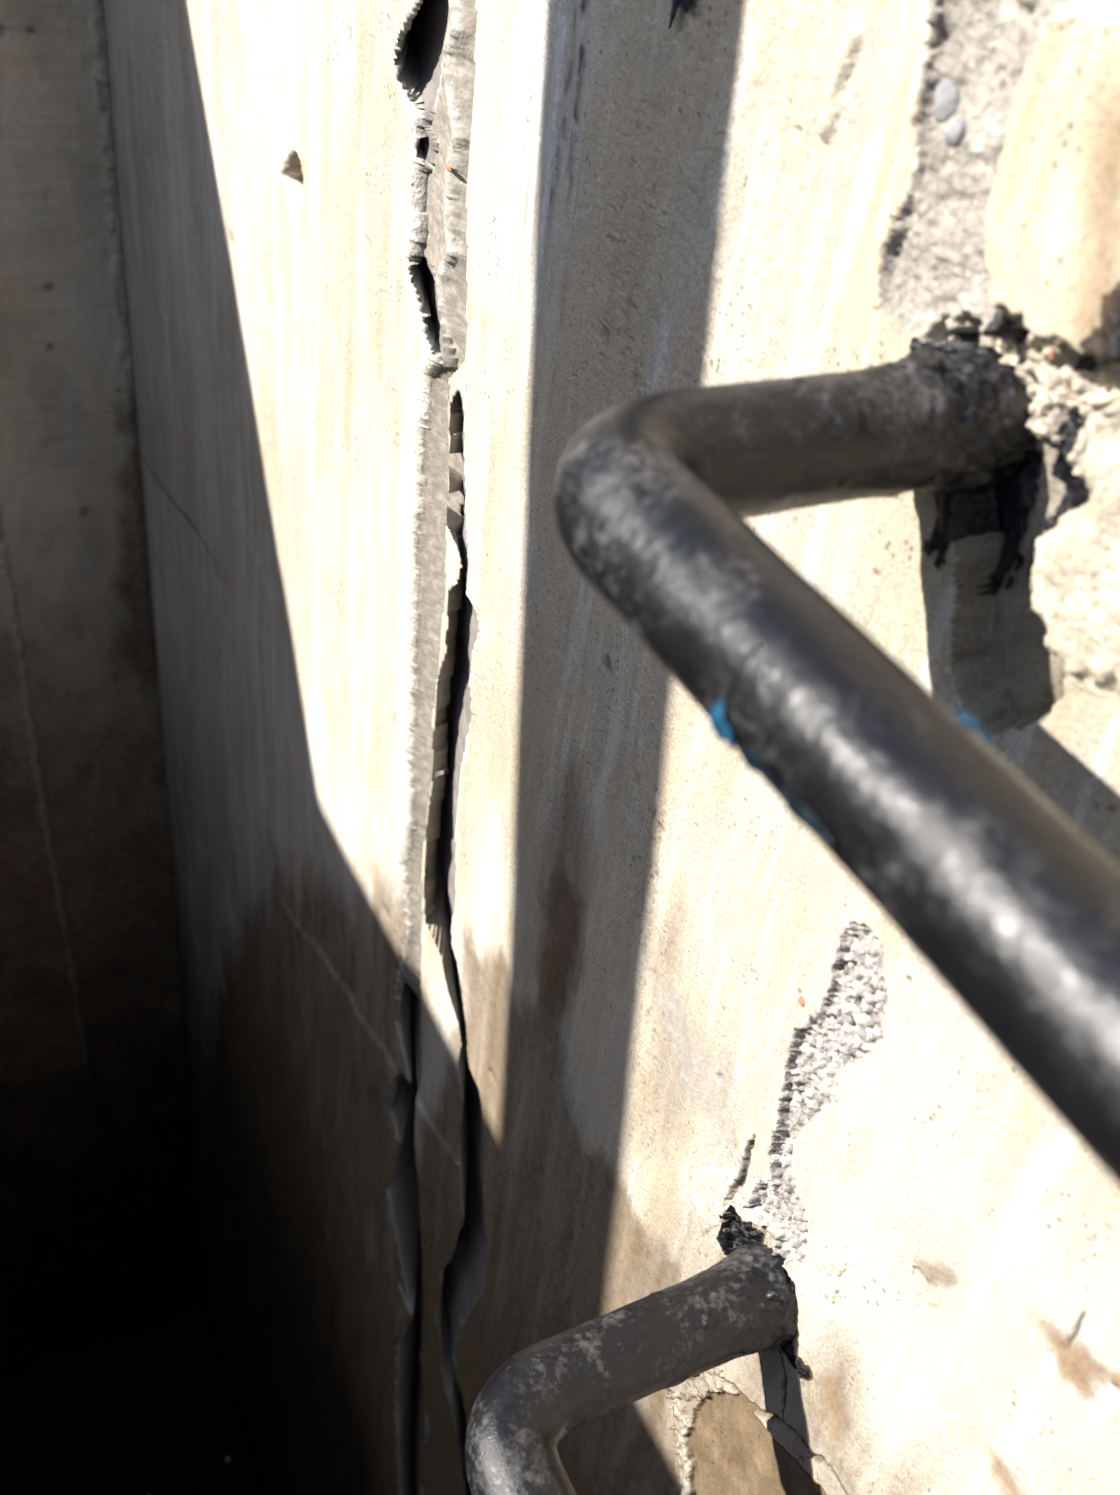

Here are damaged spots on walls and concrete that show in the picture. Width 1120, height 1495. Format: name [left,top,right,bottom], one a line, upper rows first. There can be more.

spalling [874,0,1120,739]
crack [385,0,487,1495]
spalling [691,922,888,1304]